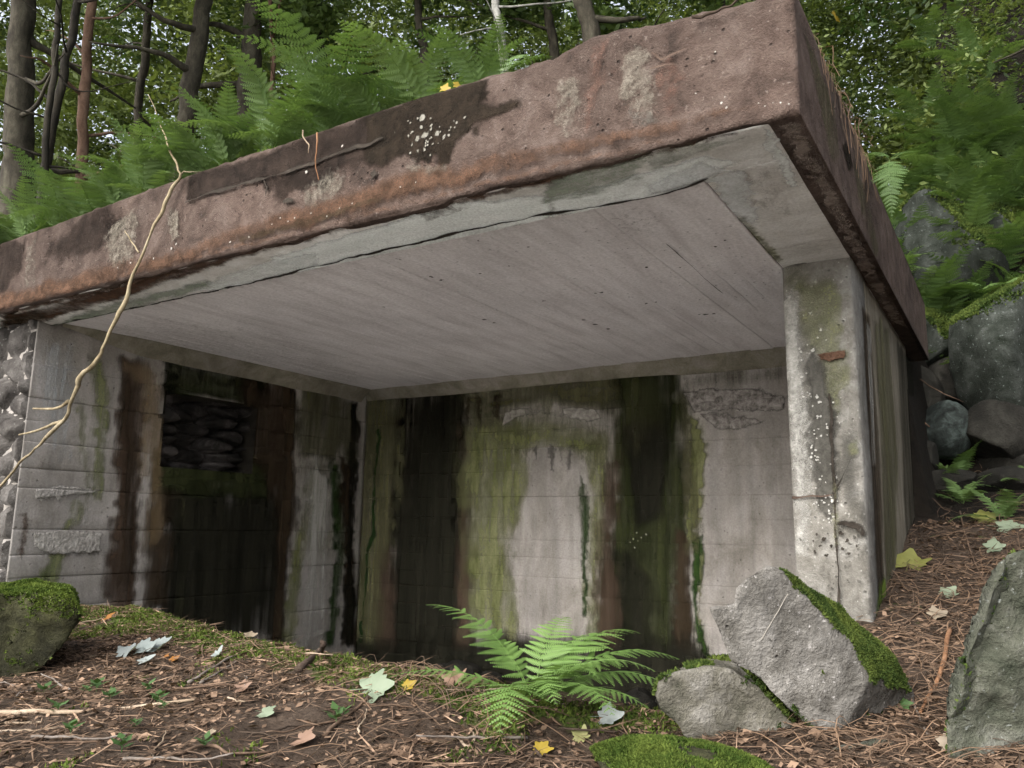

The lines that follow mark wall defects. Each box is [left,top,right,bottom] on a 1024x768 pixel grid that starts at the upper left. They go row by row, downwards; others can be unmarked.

damp [188,79,518,203]
rust [0,109,737,328]
crack [51,178,708,326]
spalling [684,388,785,429]
peeling [34,530,102,554]
damp [143,362,710,696]
crack [792,393,857,604]